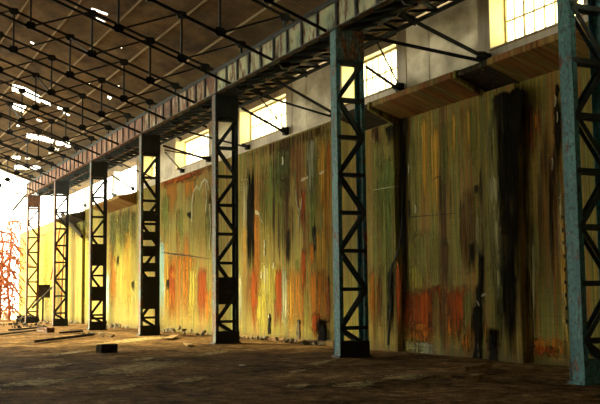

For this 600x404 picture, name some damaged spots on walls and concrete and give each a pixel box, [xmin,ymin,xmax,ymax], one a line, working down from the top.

corrosion [161,166,211,324]
leakage [239,172,254,315]
corrosion [251,173,267,326]
corrosion [274,136,330,337]
corrosion [396,261,433,343]
leakage [371,87,568,349]